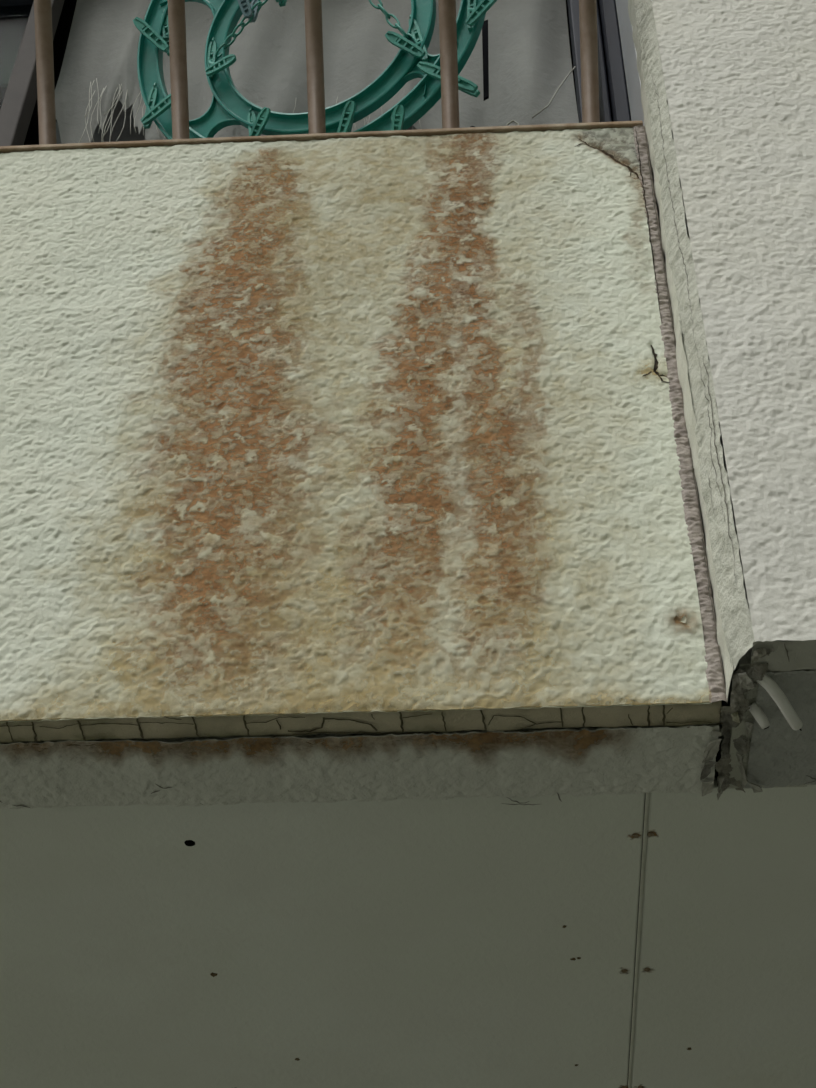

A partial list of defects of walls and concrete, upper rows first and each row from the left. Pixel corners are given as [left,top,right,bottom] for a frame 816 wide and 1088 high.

rust [105,152,316,717]
rust [318,136,552,712]
crack [575,74,735,694]
crack [0,716,200,746]
rust [94,737,285,759]
crack [243,707,593,738]
crack [628,705,723,728]
spalling [700,647,774,800]